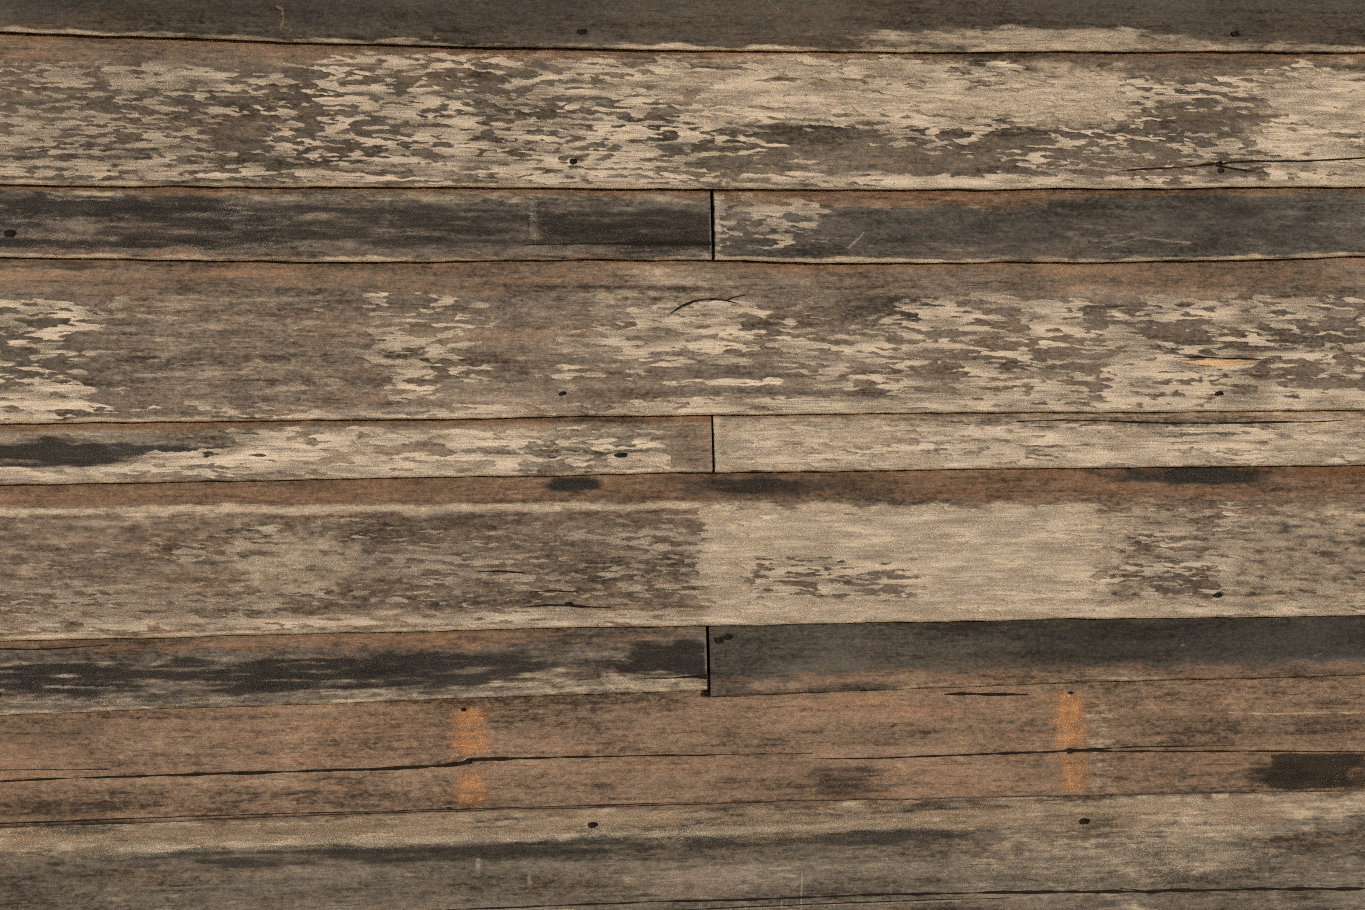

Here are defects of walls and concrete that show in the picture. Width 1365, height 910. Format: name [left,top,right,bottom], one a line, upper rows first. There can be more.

peeling [982,25,1136,47]
peeling [0,52,1365,249]
crack [1120,157,1365,172]
peeling [0,292,1365,480]
peeling [0,502,1365,635]
crack [0,745,1365,782]
crack [0,802,697,824]